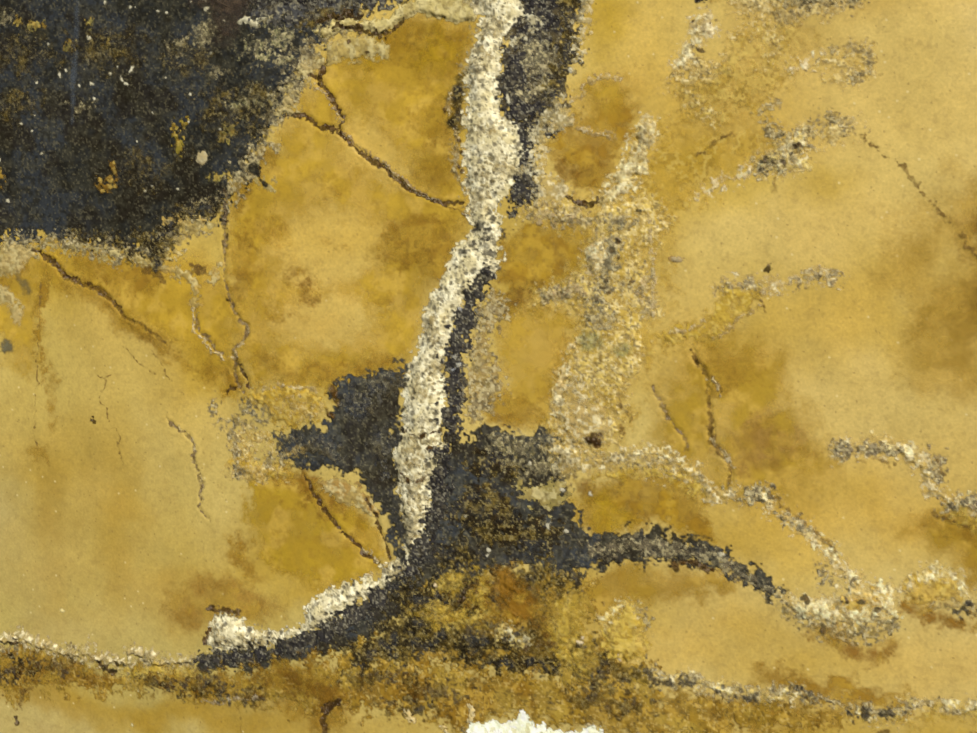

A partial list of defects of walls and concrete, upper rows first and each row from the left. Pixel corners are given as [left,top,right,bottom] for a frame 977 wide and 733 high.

crack [284,59,466,216]
leakage [668,0,877,181]
crack [31,249,166,343]
crack [191,190,250,394]
leakage [0,0,824,677]
leakage [788,267,844,290]
crack [690,349,732,479]
crack [304,475,391,576]
leakage [782,434,977,658]
crack [319,698,342,733]
spalling [461,710,603,733]
leakage [639,663,977,733]